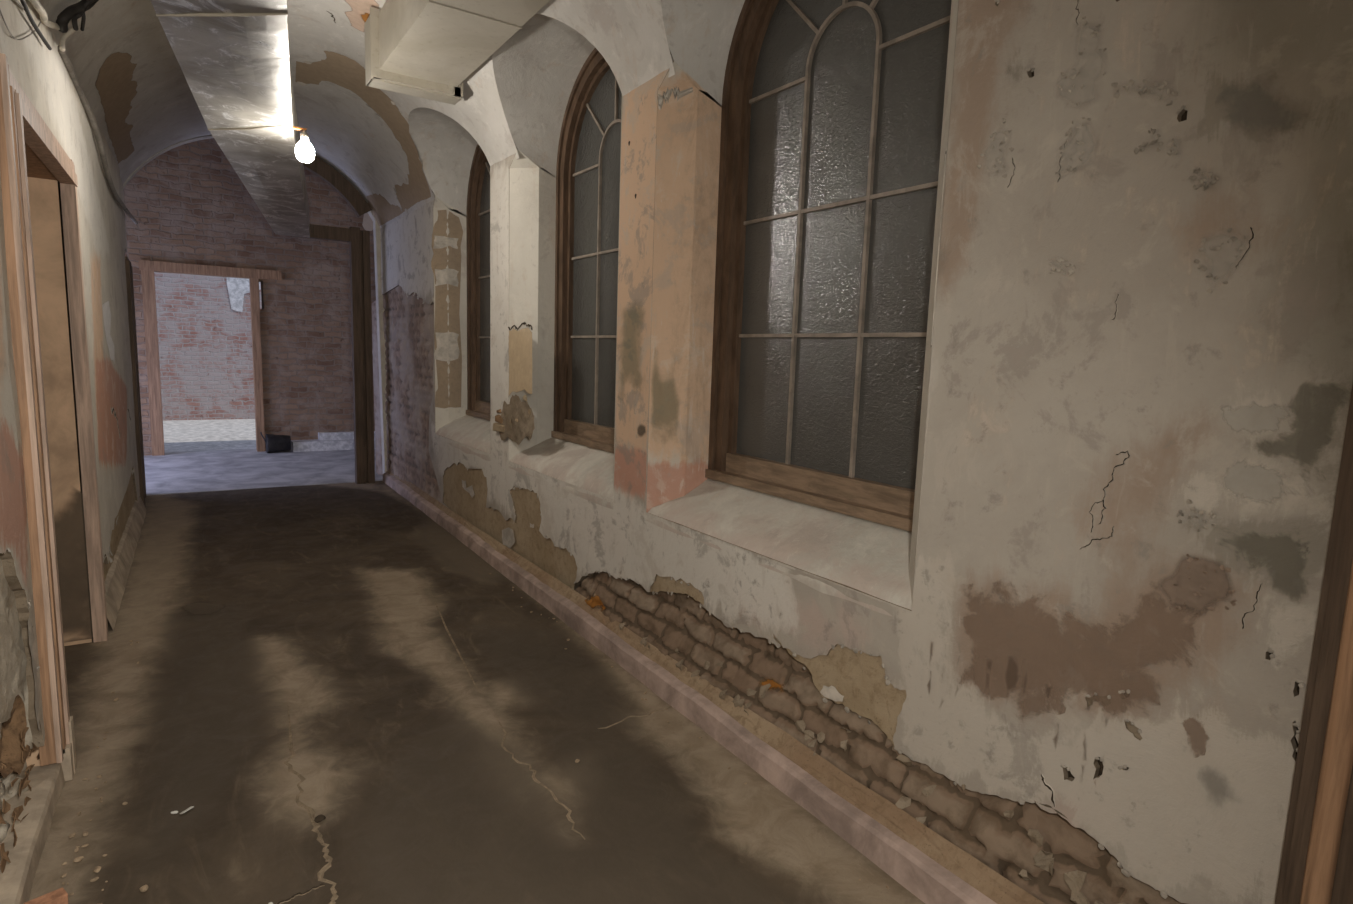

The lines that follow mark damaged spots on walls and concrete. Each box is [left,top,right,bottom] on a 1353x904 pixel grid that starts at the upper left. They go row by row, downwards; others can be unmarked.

flaking render [95,52,137,164]
flaking render [345,0,379,32]
flaking render [295,51,1216,904]
crack [1081,451,1131,549]
spalling [0,548,40,873]
crack [277,706,338,904]